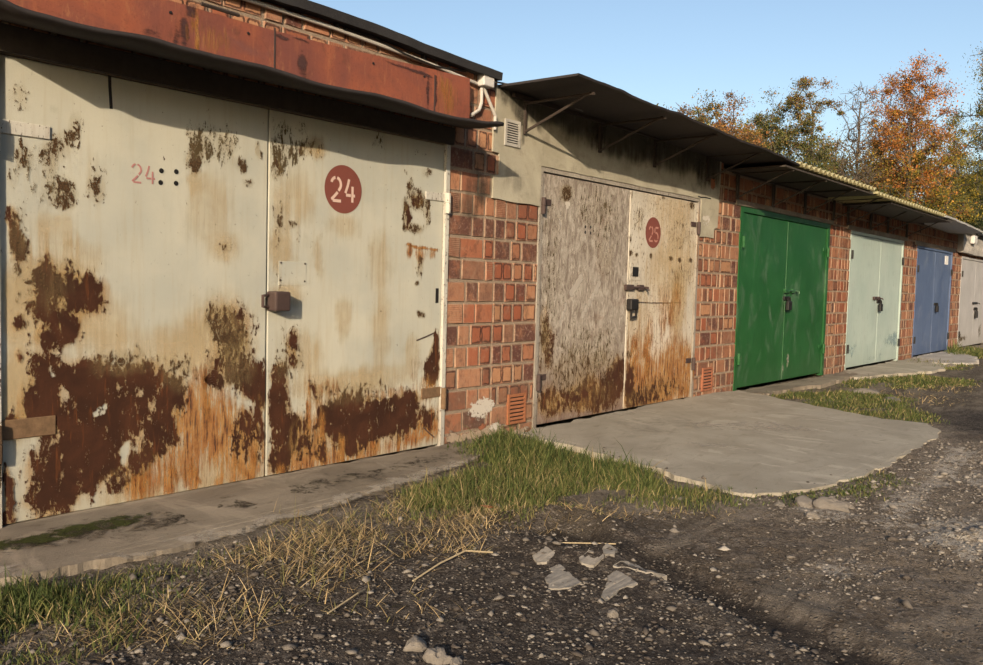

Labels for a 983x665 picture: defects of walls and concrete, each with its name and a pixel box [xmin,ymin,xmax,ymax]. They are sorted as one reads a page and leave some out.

rust [174,4,214,50]
rust [407,243,438,283]
rust [3,251,440,525]
rust [537,274,694,423]